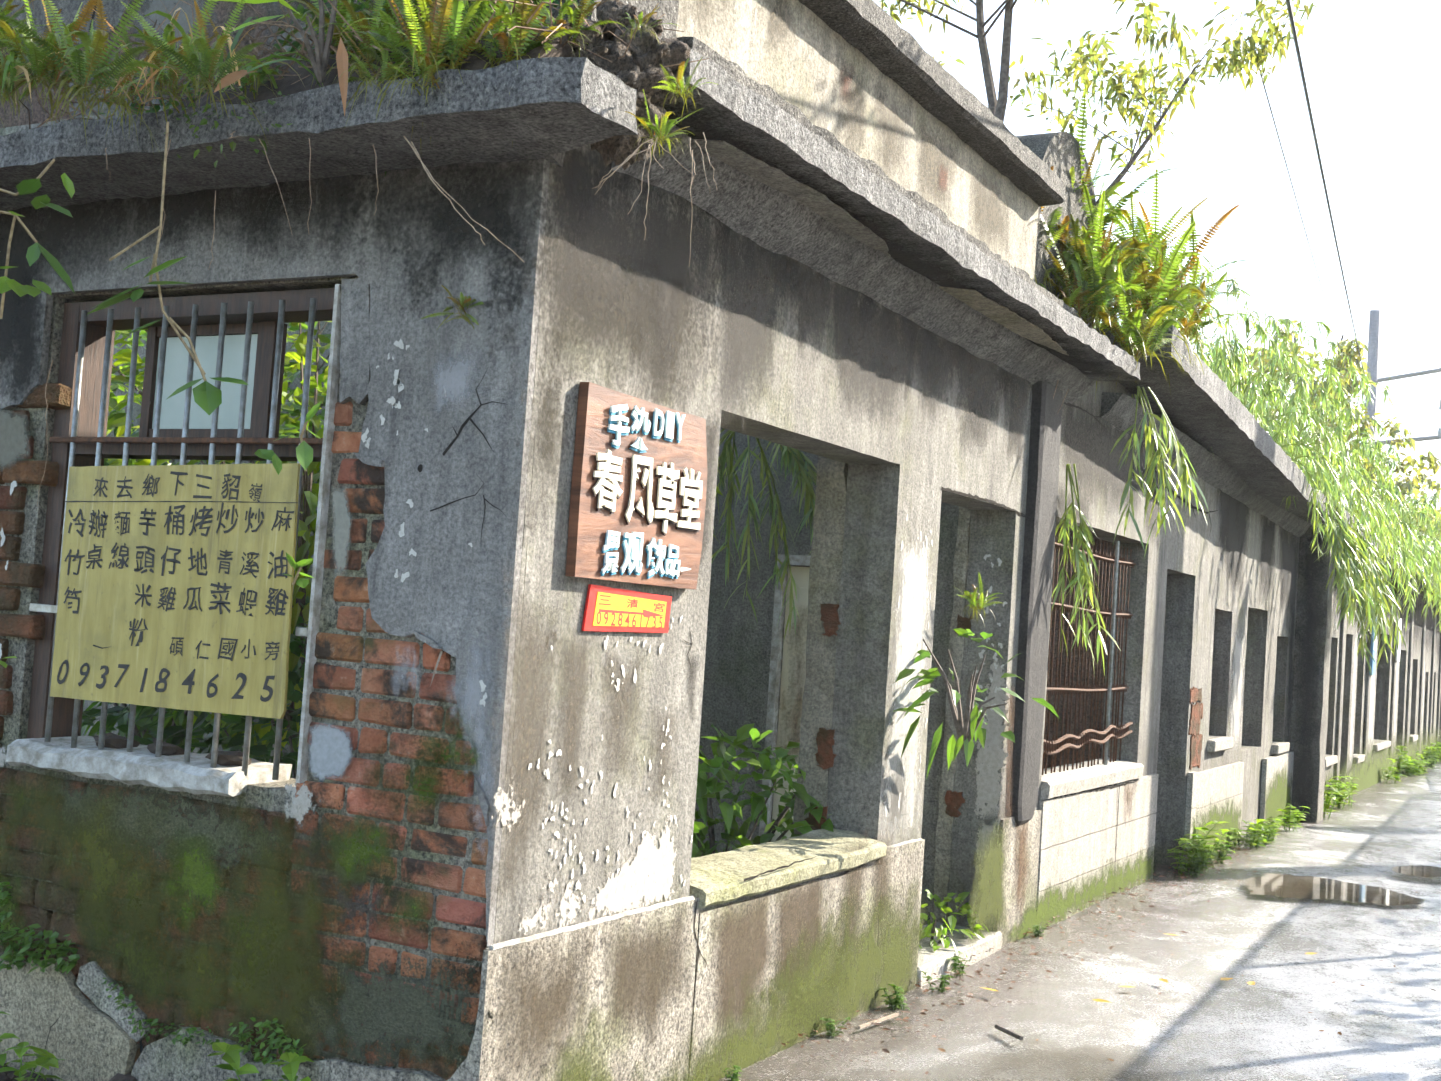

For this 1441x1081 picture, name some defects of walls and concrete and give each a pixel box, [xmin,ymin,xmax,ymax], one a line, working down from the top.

peeling [0,0,218,118]
leakage [664,104,989,298]
leakage [0,152,1028,458]
spalling [0,409,30,495]
crack [430,370,506,550]
spalling [276,339,526,1080]
peeling [604,615,683,692]
peeling [517,706,693,939]
leakage [517,960,575,1062]
leakage [613,926,682,1024]
leakage [717,881,821,1020]
leakage [844,843,889,943]